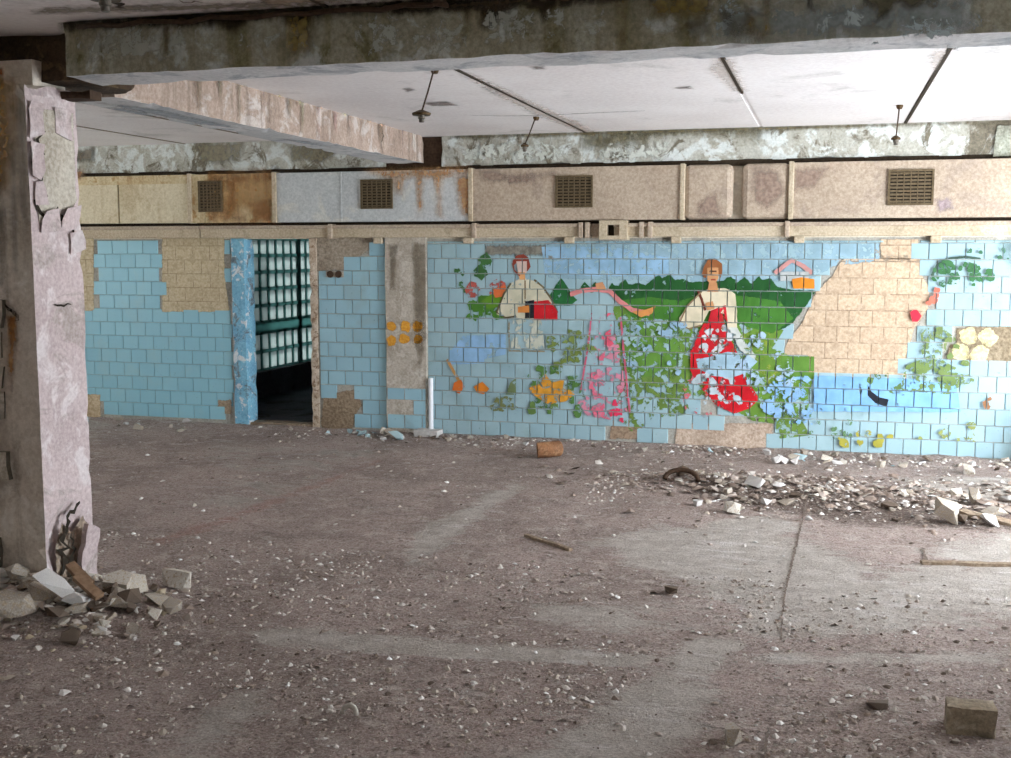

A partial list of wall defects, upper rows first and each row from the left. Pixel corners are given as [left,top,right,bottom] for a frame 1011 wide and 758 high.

peeling [482,6,607,50]
peeling [816,4,876,33]
peeling [890,16,958,49]
peeling [784,239,929,379]
peeling [947,326,1011,363]
peeling [321,390,362,429]
spalling [55,501,100,577]
crack [780,503,806,640]